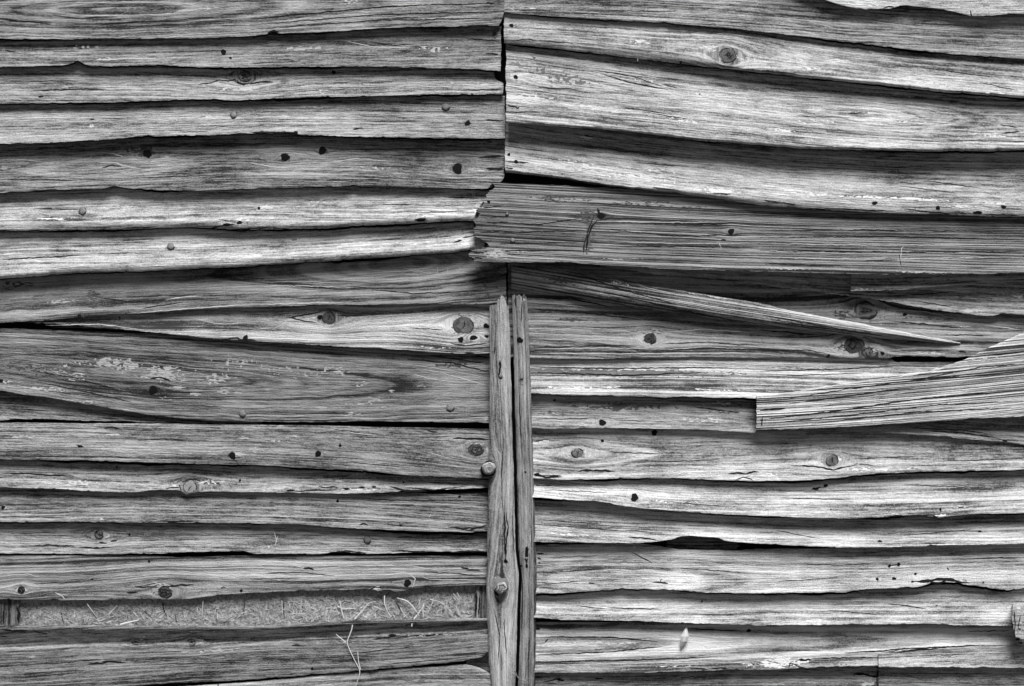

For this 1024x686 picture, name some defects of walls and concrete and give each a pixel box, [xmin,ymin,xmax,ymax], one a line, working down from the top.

crack [296,155,1022,684]